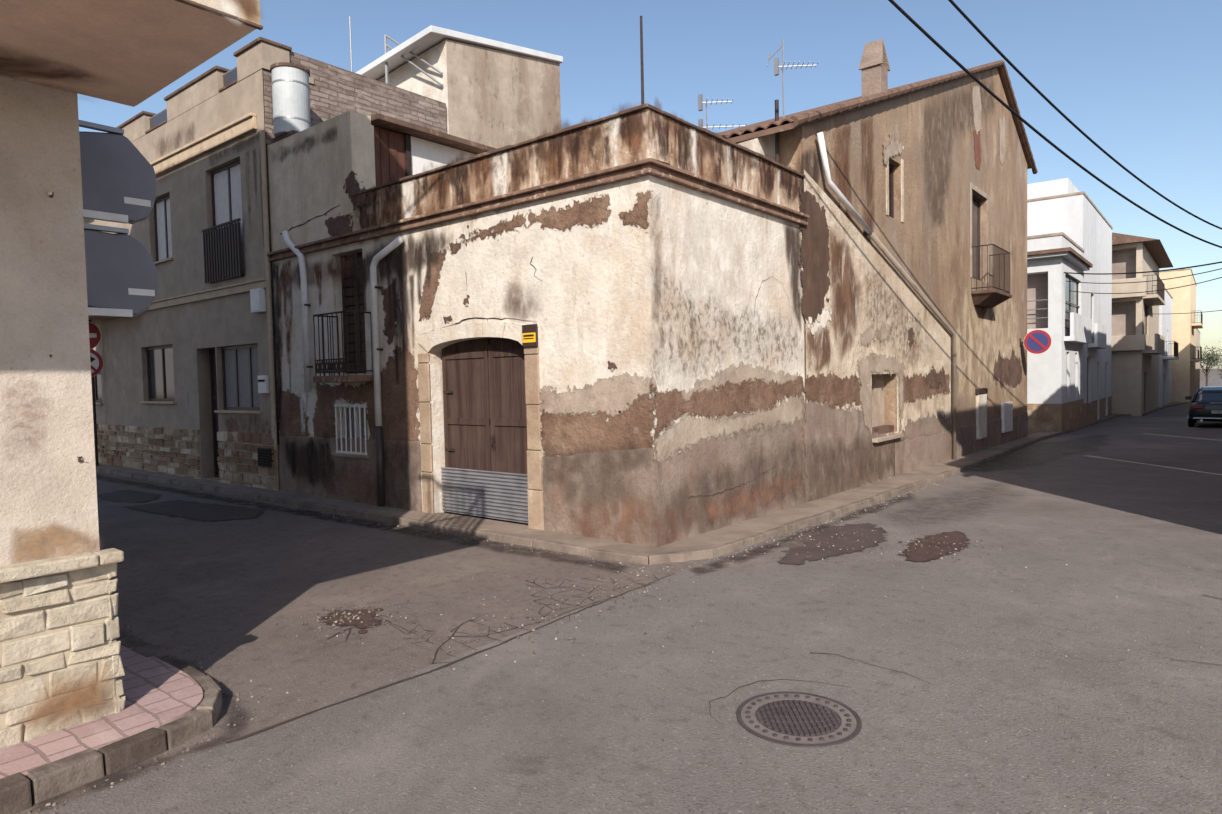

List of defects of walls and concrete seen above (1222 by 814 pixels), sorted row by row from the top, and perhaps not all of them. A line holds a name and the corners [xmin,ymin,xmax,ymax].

peeling [419,190,651,324]
water stain [361,102,920,371]
flaking render [539,326,950,466]
peeling [993,347,1022,389]